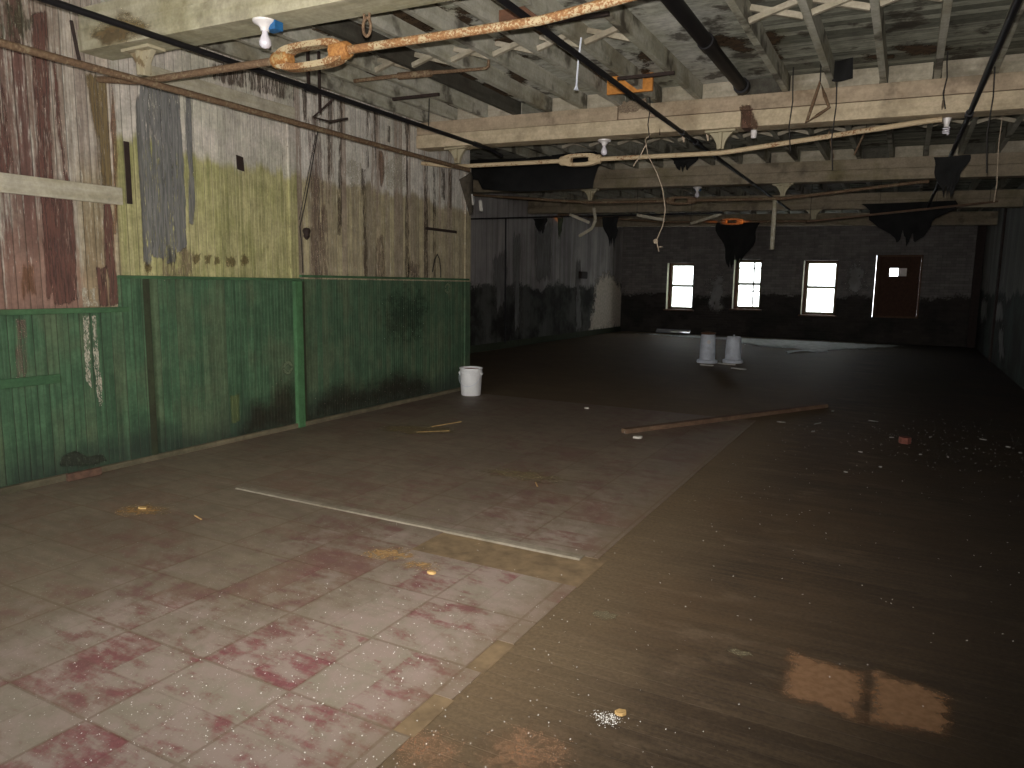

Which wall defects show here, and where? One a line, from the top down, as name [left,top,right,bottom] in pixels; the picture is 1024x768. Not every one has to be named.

peeling [0,85,14,174]
peeling [31,11,69,181]
peeling [40,197,118,404]